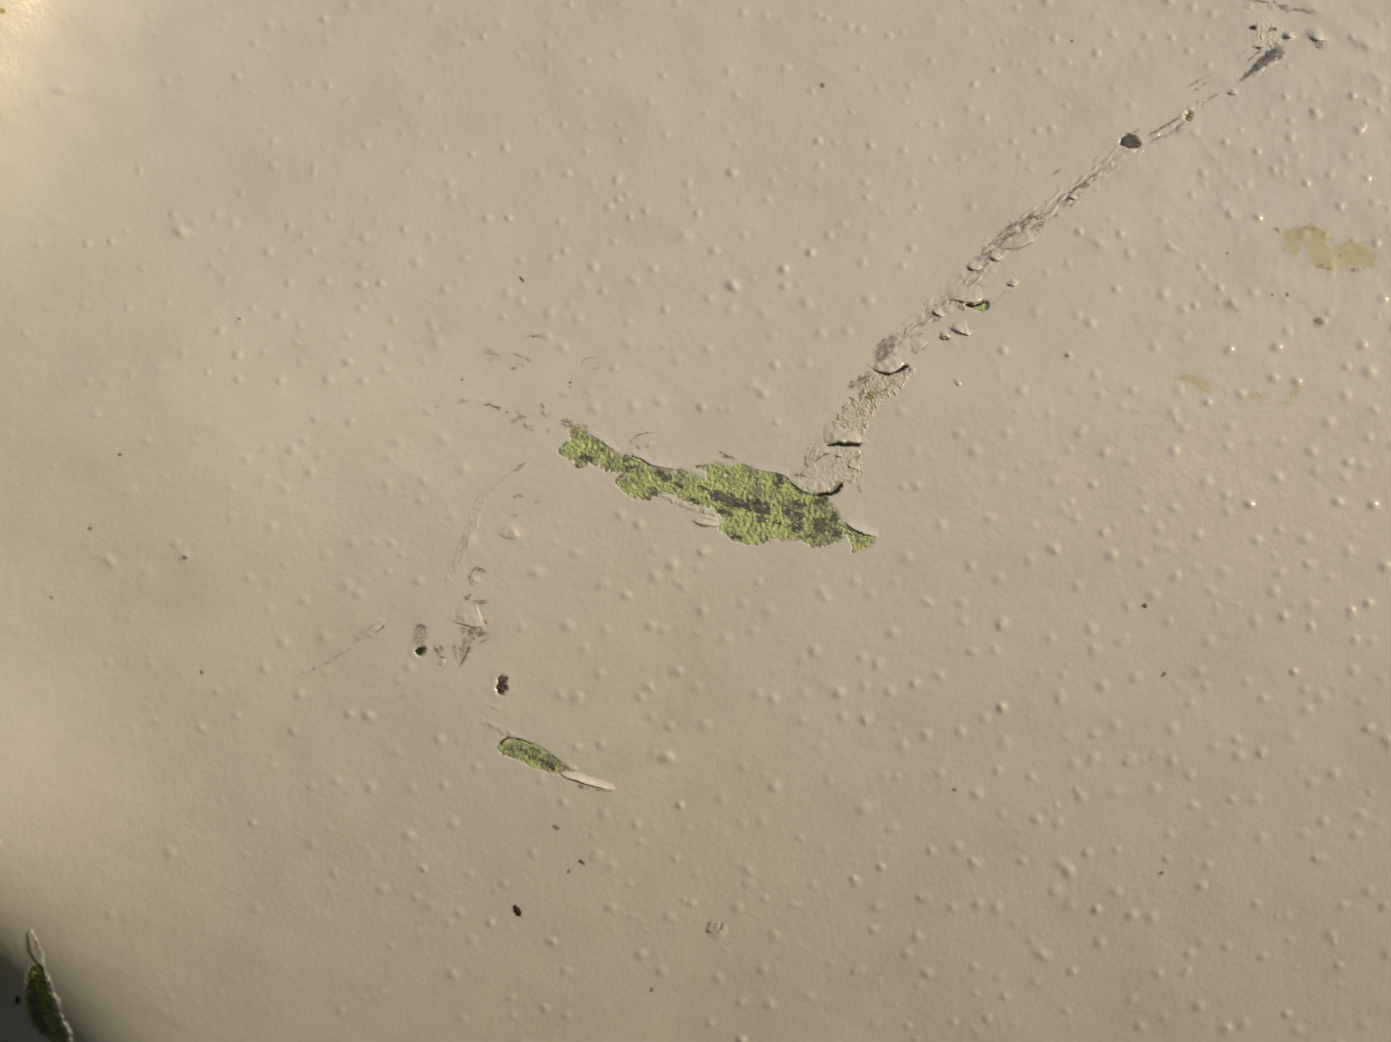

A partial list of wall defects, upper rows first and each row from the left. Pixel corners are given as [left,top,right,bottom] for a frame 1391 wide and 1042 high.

peeling [1120,133,1143,155]
peeling [932,309,974,340]
peeling [557,420,879,553]
peeling [498,737,616,790]
peeling [24,928,75,1042]